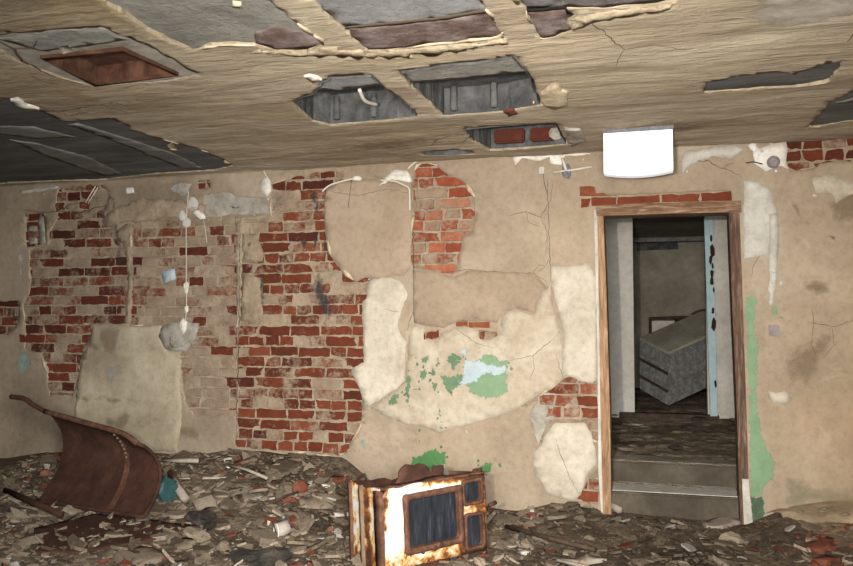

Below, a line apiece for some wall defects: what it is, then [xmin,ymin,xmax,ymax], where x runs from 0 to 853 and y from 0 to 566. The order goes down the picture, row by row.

peeling [571,1,678,31]
spalling [0,27,197,84]
peeling [198,23,508,61]
crack [565,19,686,65]
peeling [304,74,322,83]
peeling [10,97,39,111]
spalling [0,162,599,508]